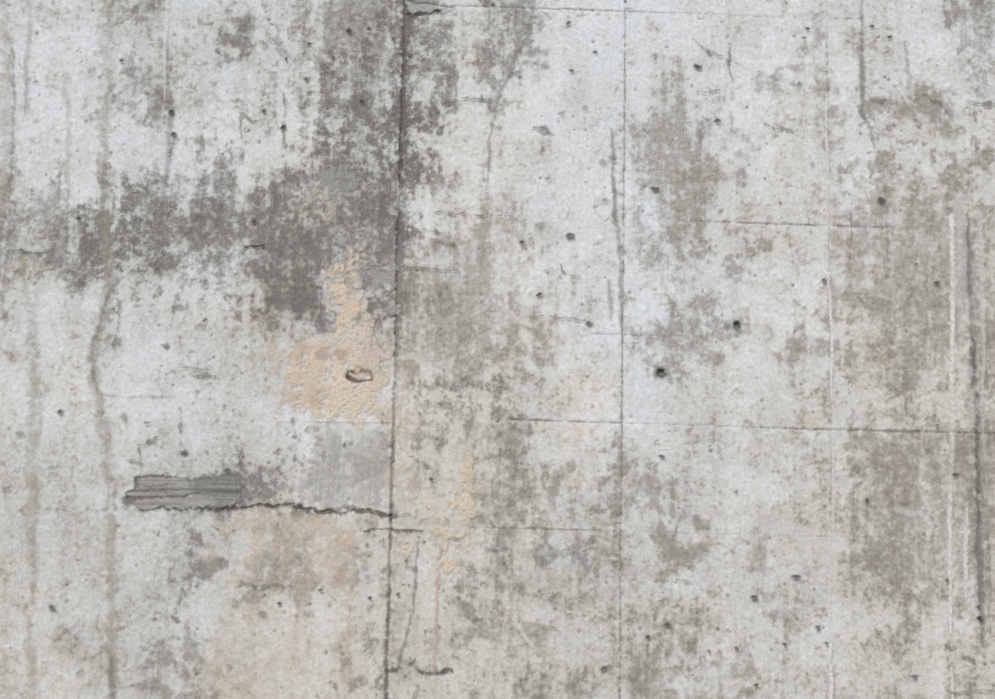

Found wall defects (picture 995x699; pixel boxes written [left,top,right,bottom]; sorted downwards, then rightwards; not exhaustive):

damp [81,59,458,332]
peeling [277,228,396,429]
spalling [123,469,241,510]
crack [140,499,422,532]